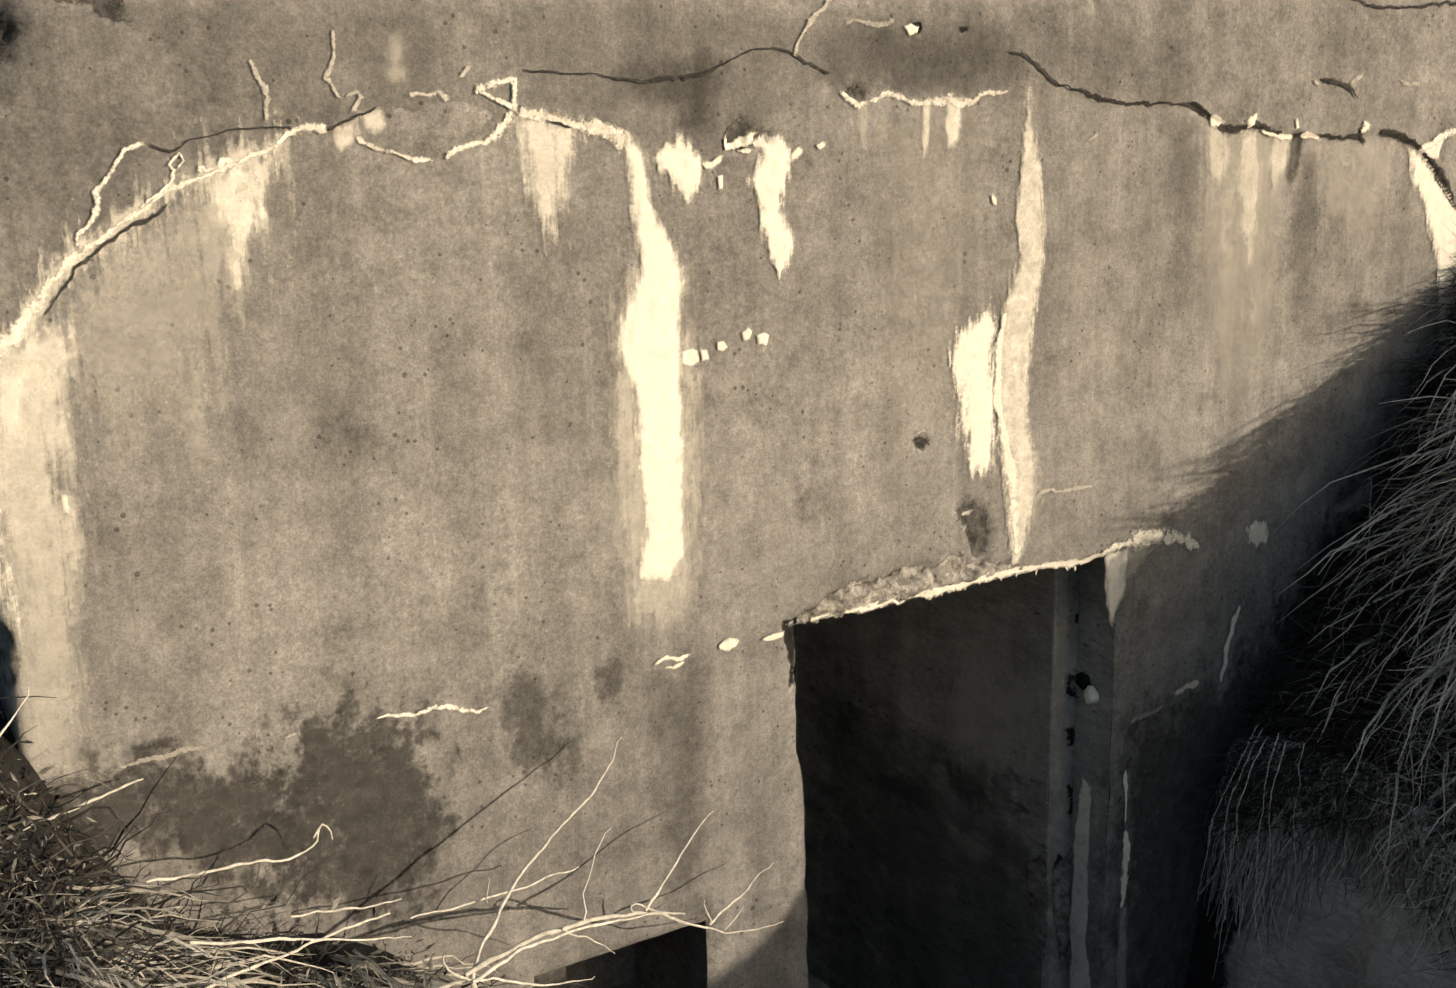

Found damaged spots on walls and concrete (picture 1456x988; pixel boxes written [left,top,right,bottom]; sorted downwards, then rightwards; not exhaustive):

crack [0,30,515,369]
leakage [511,107,695,581]
crack [524,0,1008,157]
leakage [991,88,1046,565]
crack [1010,51,1456,210]
crack [1356,0,1456,10]
leakage [1409,139,1456,359]
leakage [0,321,82,638]
spalling [782,500,1107,687]
crack [118,746,202,768]
leakage [53,695,456,933]
crack [377,704,489,719]